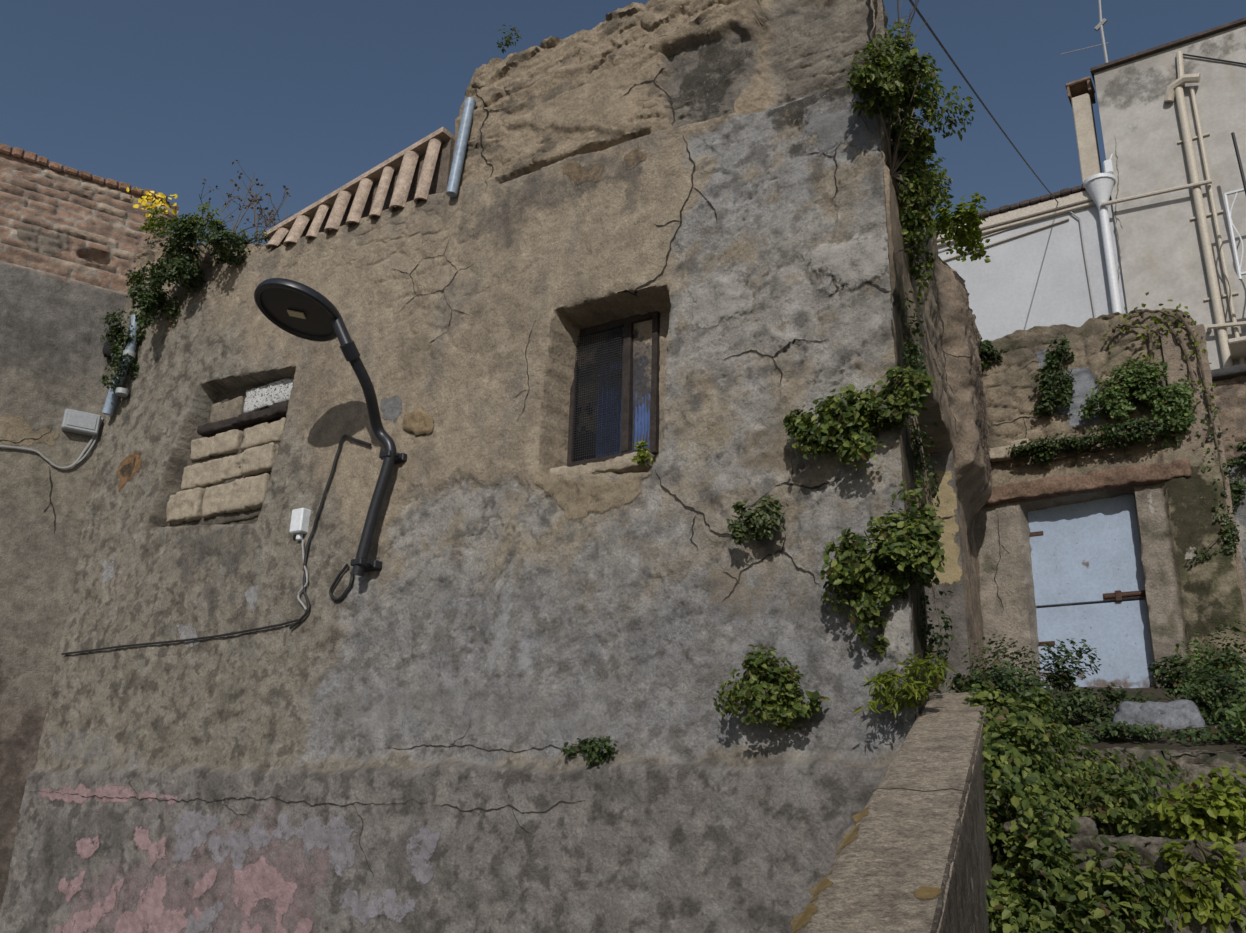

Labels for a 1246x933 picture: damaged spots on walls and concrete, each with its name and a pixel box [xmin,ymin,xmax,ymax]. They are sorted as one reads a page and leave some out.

crack [617,68,718,298]
crack [0,425,53,443]
crack [44,468,56,532]
crack [655,471,819,602]
crack [745,459,836,508]
peeling [916,469,962,586]
peeling [39,783,416,933]
peeling [406,825,443,884]